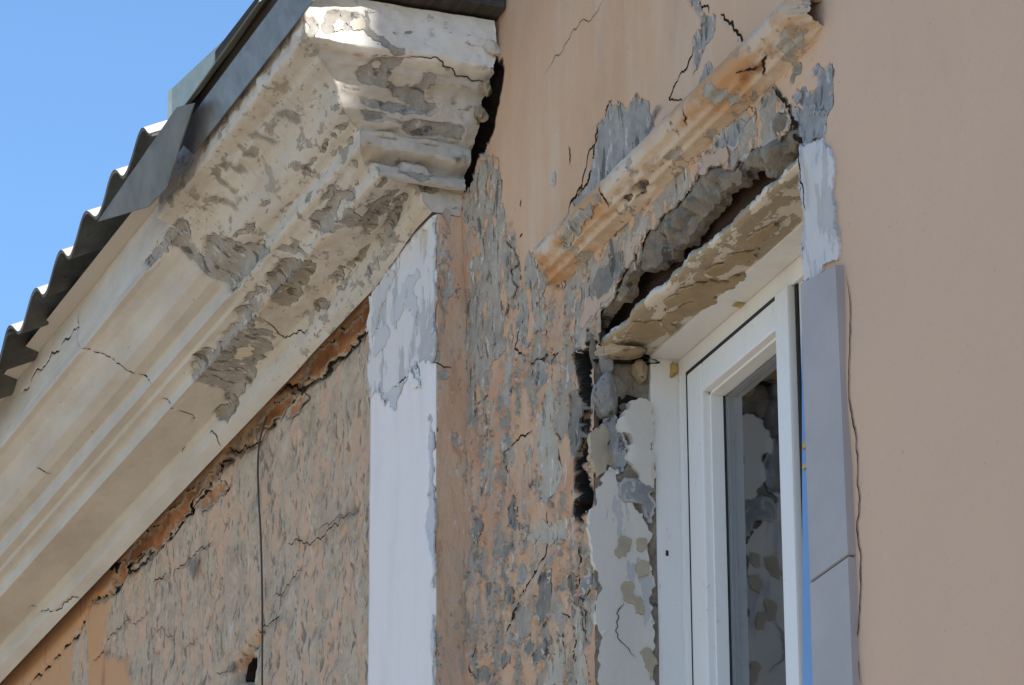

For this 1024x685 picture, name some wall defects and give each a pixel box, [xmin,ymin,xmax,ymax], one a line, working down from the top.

peeling [305,9,465,140]
crack [405,56,504,188]
crack [669,47,694,124]
peeling [689,0,716,83]
flaking render [145,218,316,423]
crack [284,335,365,392]
peeling [254,62,842,588]
crack [25,314,276,685]
crack [289,509,360,546]
crack [846,278,861,635]
hole [217,657,258,682]
peeling [504,560,593,685]